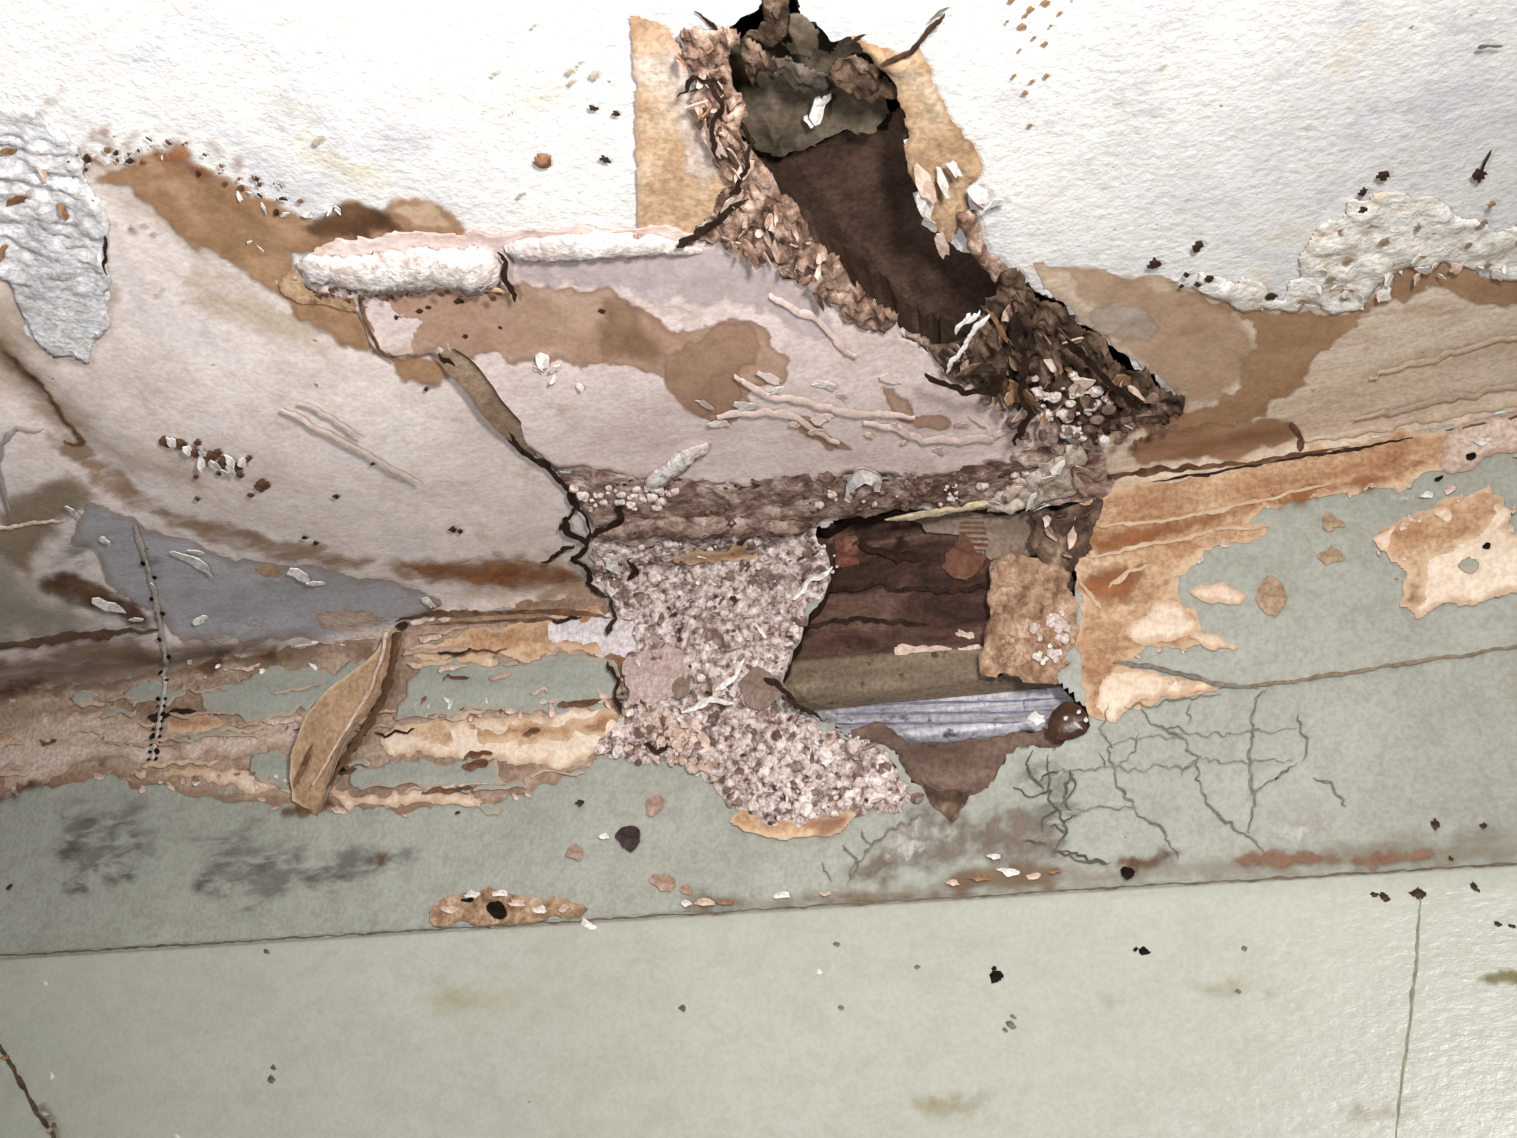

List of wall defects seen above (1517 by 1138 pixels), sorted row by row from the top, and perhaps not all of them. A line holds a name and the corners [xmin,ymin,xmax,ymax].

damp [566,61,600,85]
corrosion [1005,0,1063,52]
damp [67,130,464,387]
crack [438,353,461,369]
damp [0,308,375,698]
crack [396,431,639,625]
peeling [0,90,1517,840]
damp [392,557,587,599]
crack [0,627,159,650]
crack [0,644,1517,956]
mould [198,847,386,896]
crack [0,1044,57,1138]